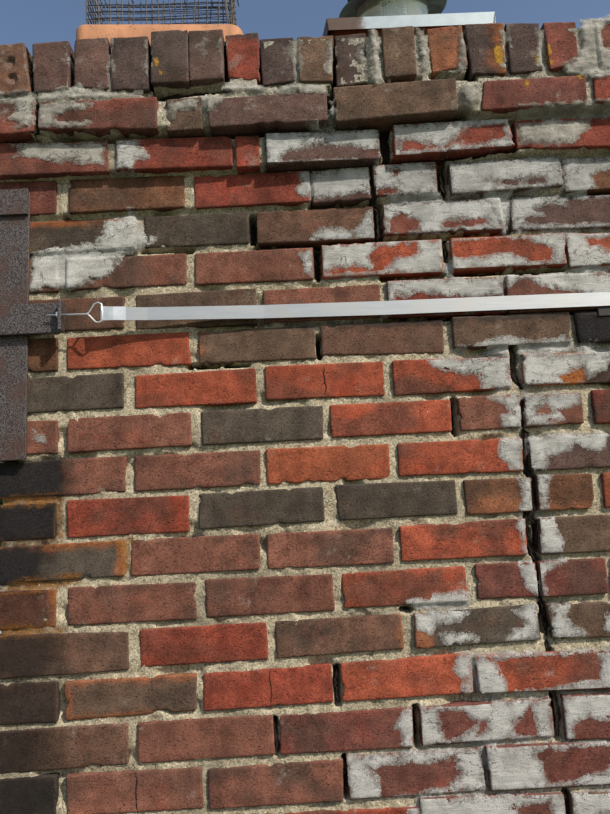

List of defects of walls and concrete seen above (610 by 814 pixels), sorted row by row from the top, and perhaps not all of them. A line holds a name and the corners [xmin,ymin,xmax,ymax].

crack [510,346,551,651]
crack [333,669,341,703]
crack [269,670,279,752]
crack [553,690,561,736]
crack [341,759,349,793]
crack [562,791,570,814]